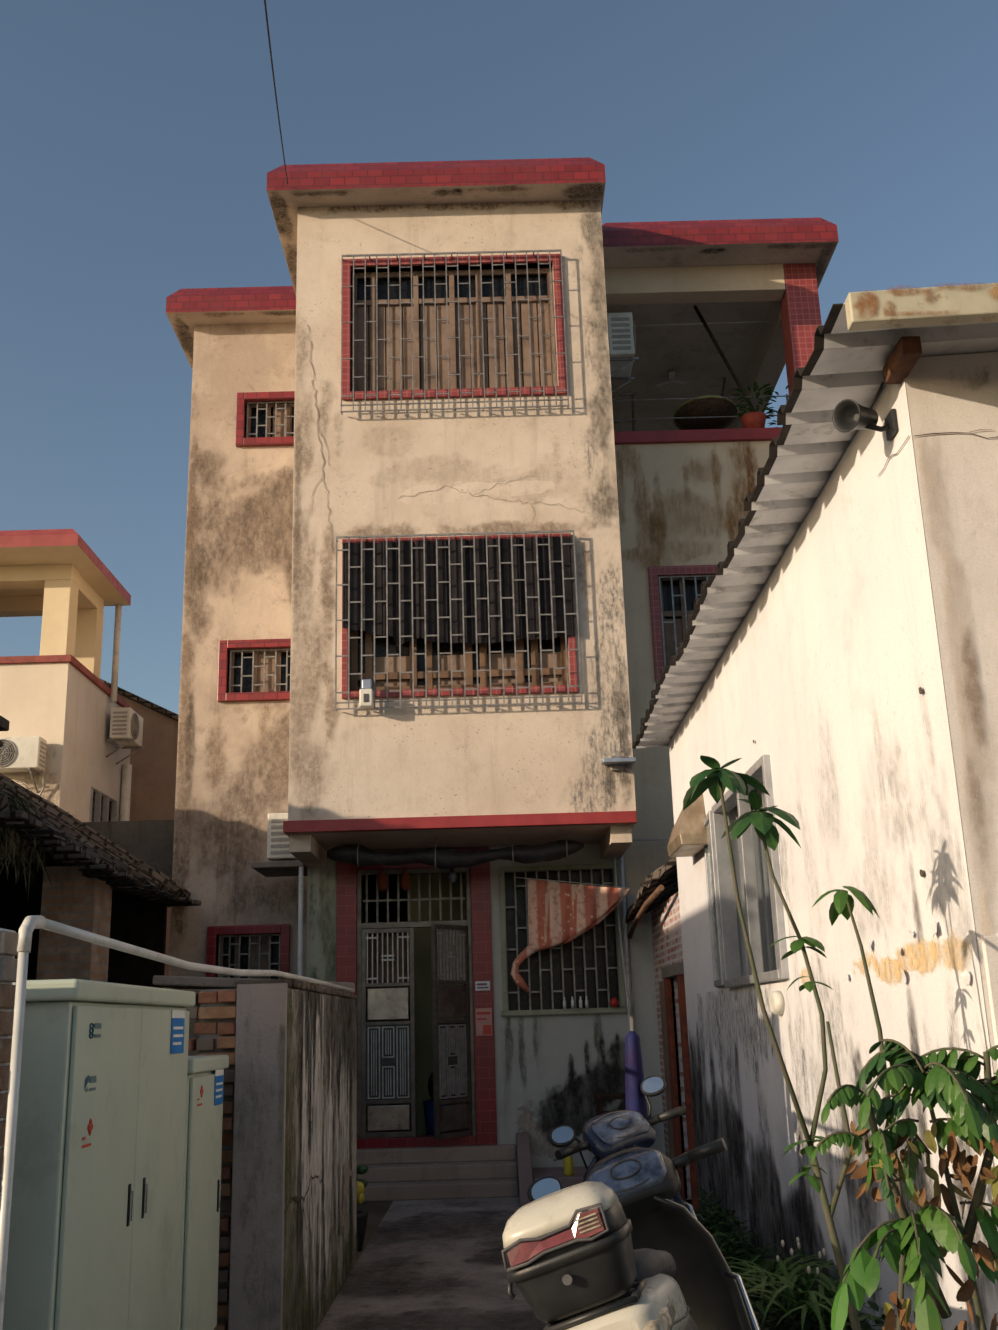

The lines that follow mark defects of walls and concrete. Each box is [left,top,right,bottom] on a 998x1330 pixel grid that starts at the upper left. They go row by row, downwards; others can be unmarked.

crack [307,325,334,550]
crack [399,475,590,524]
crack [878,429,998,476]
damp [173,445,318,913]
mould [574,571,630,812]
damp [298,990,548,1330]
damp [540,1027,626,1140]
damp [688,988,864,1329]
damp [826,1049,933,1256]
damp [908,1010,918,1054]
peeling [846,921,998,1064]
damp [953,1173,989,1330]